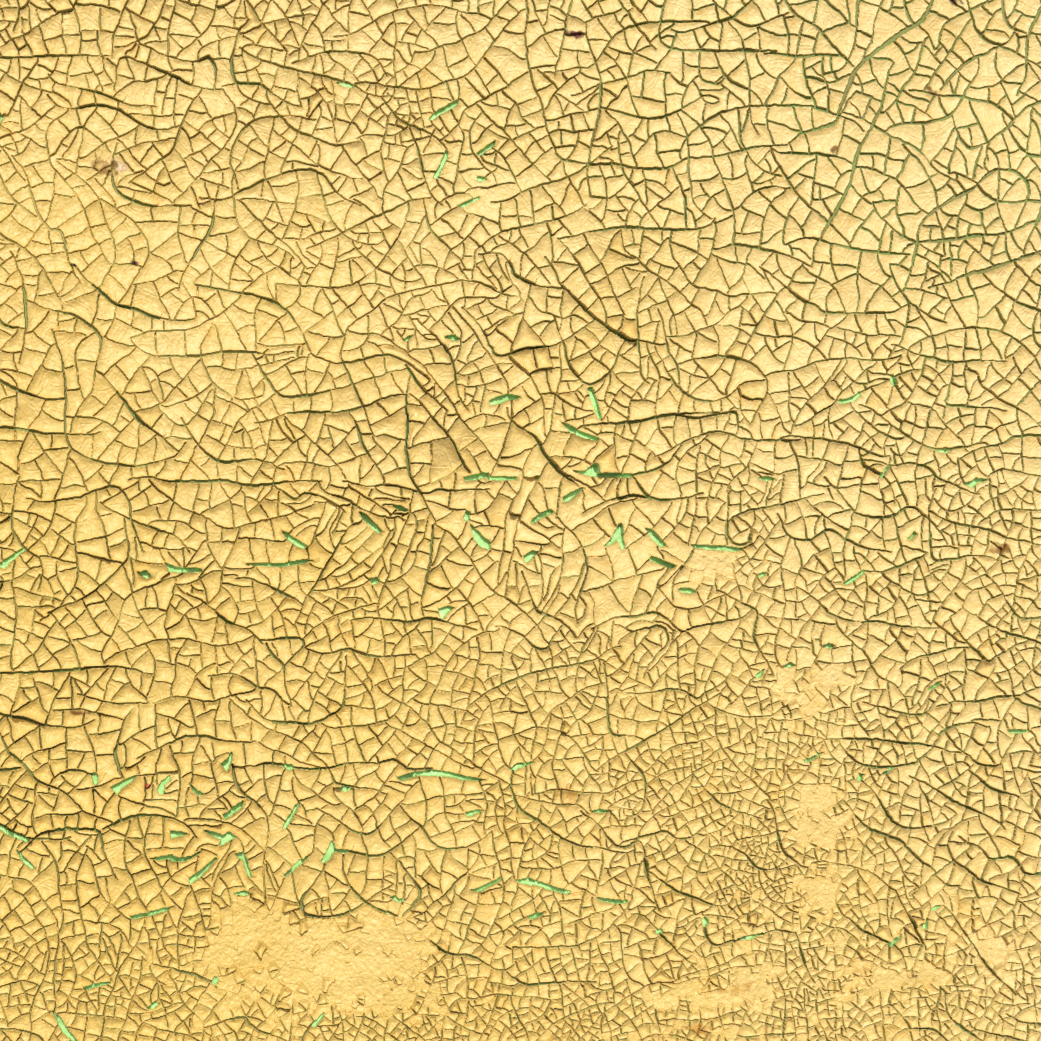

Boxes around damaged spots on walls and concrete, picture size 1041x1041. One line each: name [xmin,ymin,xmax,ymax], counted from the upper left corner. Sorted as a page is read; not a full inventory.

peeling [481,365,533,427]
crack [542,478,563,522]
peeling [436,375,745,609]
crack [1011,708,1041,745]
peeling [77,739,366,904]
peeling [445,798,486,824]
peeling [0,825,54,882]
peeling [516,866,570,920]
crack [692,917,748,989]
crack [713,905,835,1041]
crack [818,898,1041,1041]
crack [276,992,447,1041]